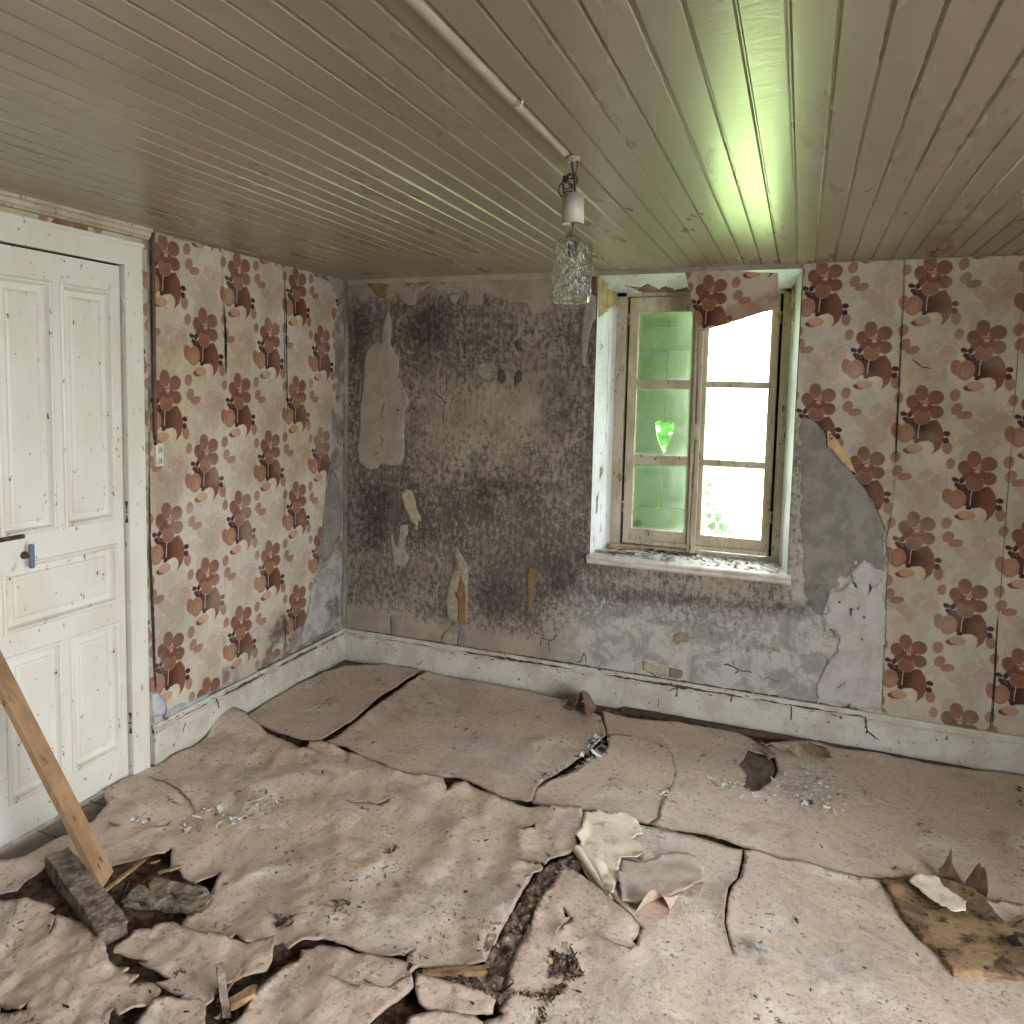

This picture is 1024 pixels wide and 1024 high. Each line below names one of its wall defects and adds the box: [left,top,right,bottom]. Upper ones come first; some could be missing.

flaking render [357,312,409,469]
flaking render [294,548,343,648]
flaking render [434,546,498,660]
peeling [810,559,886,719]